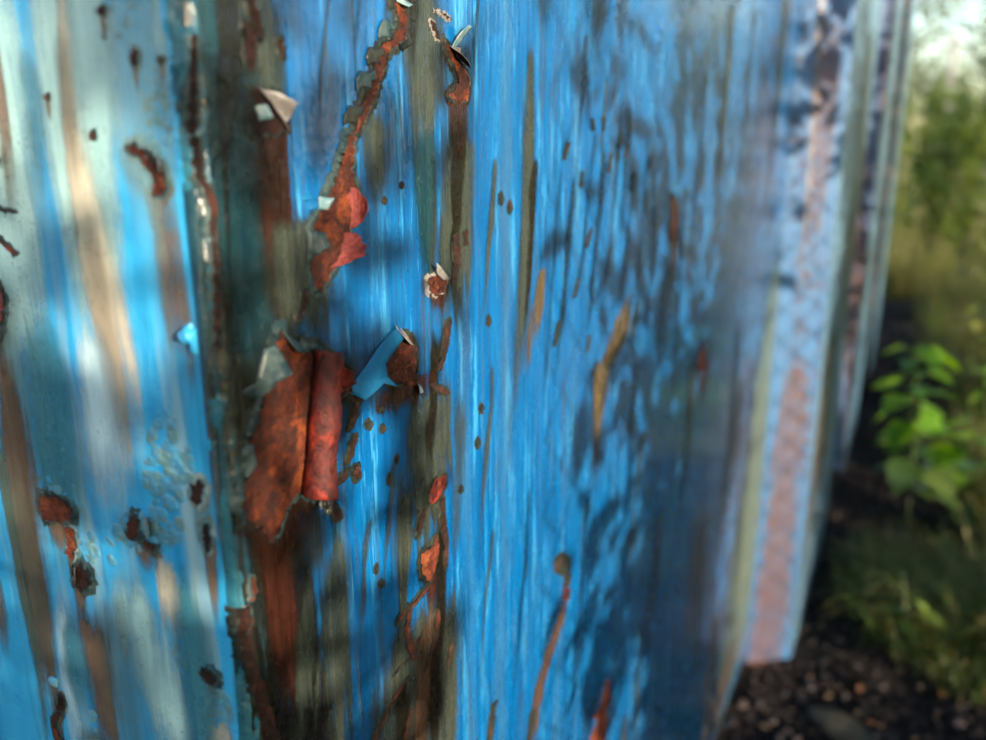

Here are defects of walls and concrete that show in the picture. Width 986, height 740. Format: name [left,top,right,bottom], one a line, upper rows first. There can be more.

peeling [244,83,298,176]
peeling [305,0,413,298]
peeling [440,25,472,154]
peeling [424,264,450,309]
corrosion [669,190,680,285]
corrosion [0,360,81,709]
peeling [186,472,218,609]
peeling [227,318,434,566]
corrosion [426,472,448,515]
corrosion [260,541,298,692]
corrosion [414,531,440,740]
corrosion [528,555,571,740]